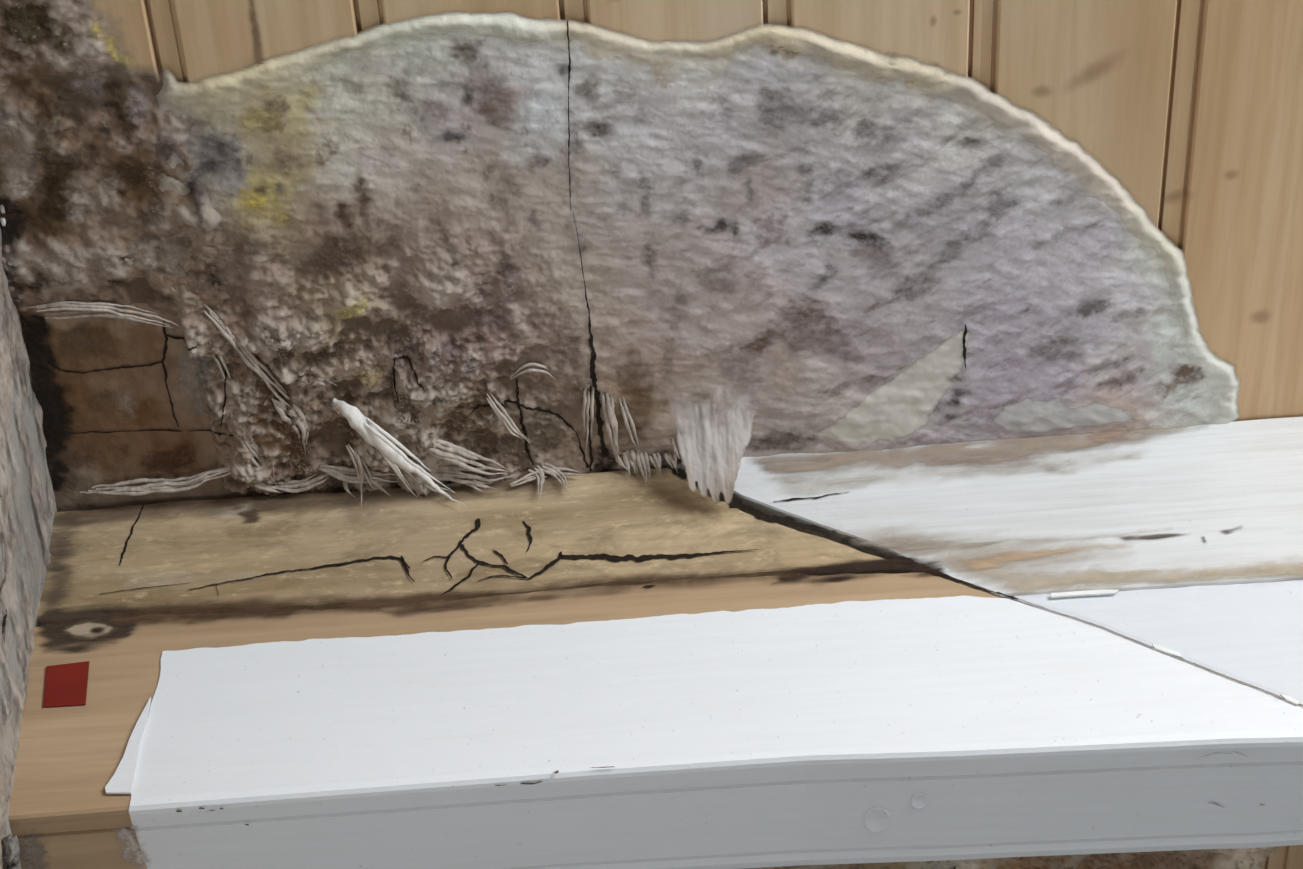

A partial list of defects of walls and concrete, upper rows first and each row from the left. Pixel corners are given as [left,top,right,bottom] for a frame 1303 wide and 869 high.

crack [100,504,759,596]
crack [471,20,609,472]
leakage [0,0,1303,652]
leakage [743,846,1276,869]